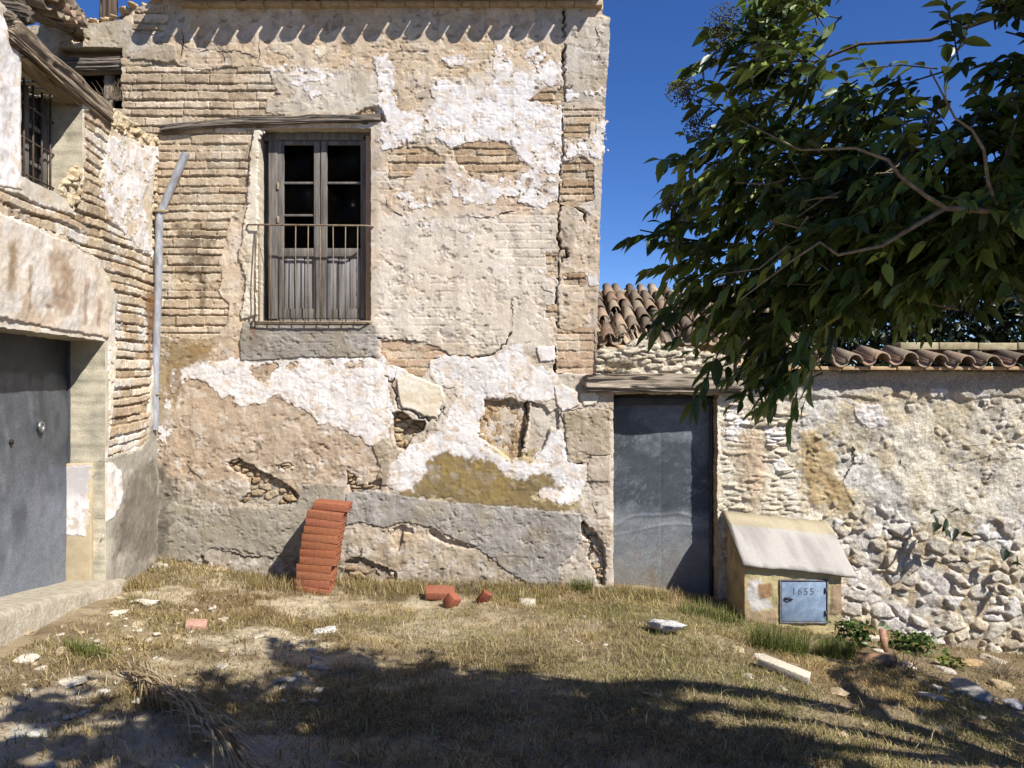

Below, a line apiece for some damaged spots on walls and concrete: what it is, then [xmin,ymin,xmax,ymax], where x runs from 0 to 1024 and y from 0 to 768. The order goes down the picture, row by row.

crack [559,11,567,80]
flaking render [0,15,609,537]
crack [553,120,585,374]
water stain [400,451,570,511]
crack [518,401,603,585]